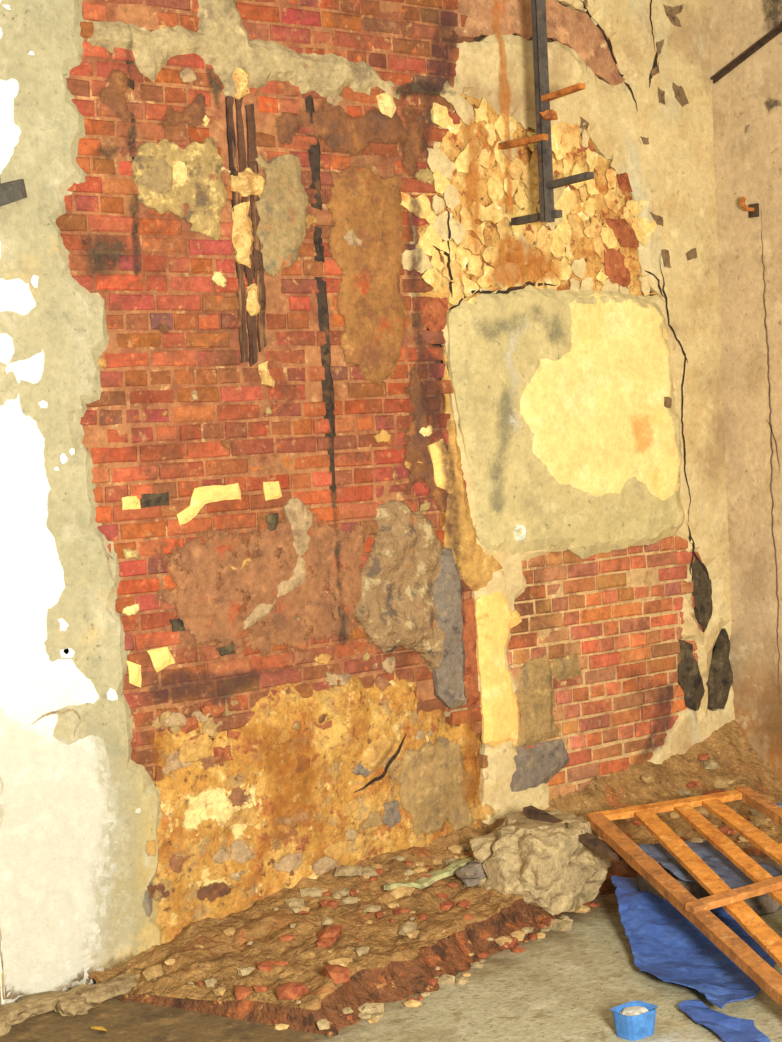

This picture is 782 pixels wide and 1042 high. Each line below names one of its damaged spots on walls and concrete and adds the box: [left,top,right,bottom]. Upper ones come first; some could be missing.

crack [580,0,658,111]
peeling [0,78,21,175]
peeling [0,275,39,315]
peeling [0,333,44,384]
flaking render [55,0,733,944]
crack [761,213,781,695]
peeling [0,393,118,1005]